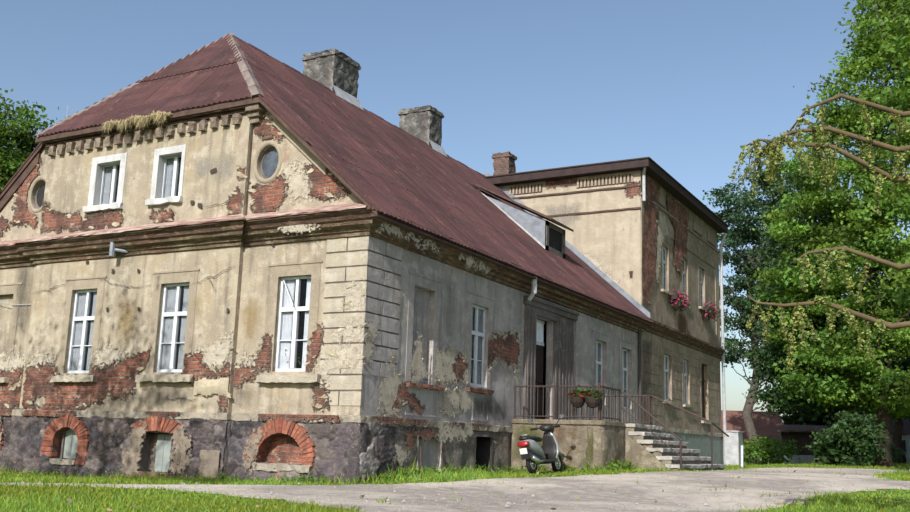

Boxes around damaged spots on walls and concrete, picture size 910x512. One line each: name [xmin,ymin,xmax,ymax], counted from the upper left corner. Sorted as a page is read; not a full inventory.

flaking render [254,114,285,143]
flaking render [0,157,124,236]
flaking render [149,207,176,224]
flaking render [226,159,351,216]
peeling [278,223,320,234]
peeling [379,220,439,254]
peeling [458,252,490,274]
flaking render [578,175,689,305]
flaking render [0,344,152,449]
flaking render [180,330,272,413]
peeling [242,278,380,474]
flaking render [375,326,523,466]